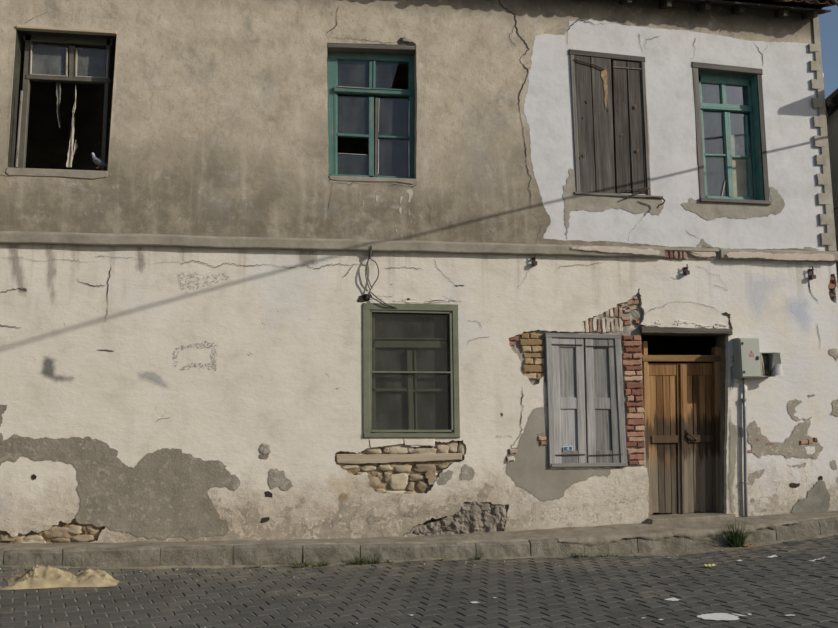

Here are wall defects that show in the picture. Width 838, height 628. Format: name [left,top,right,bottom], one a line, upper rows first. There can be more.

crack [498,0,540,244]
crack [5,255,464,323]
flaking render [509,293,646,468]
peeling [0,405,240,543]
flaking render [259,443,271,459]
peeling [265,468,293,497]
flaking render [334,438,475,494]
flaking render [504,448,518,464]
peeling [747,394,823,467]
flaking render [400,501,510,536]